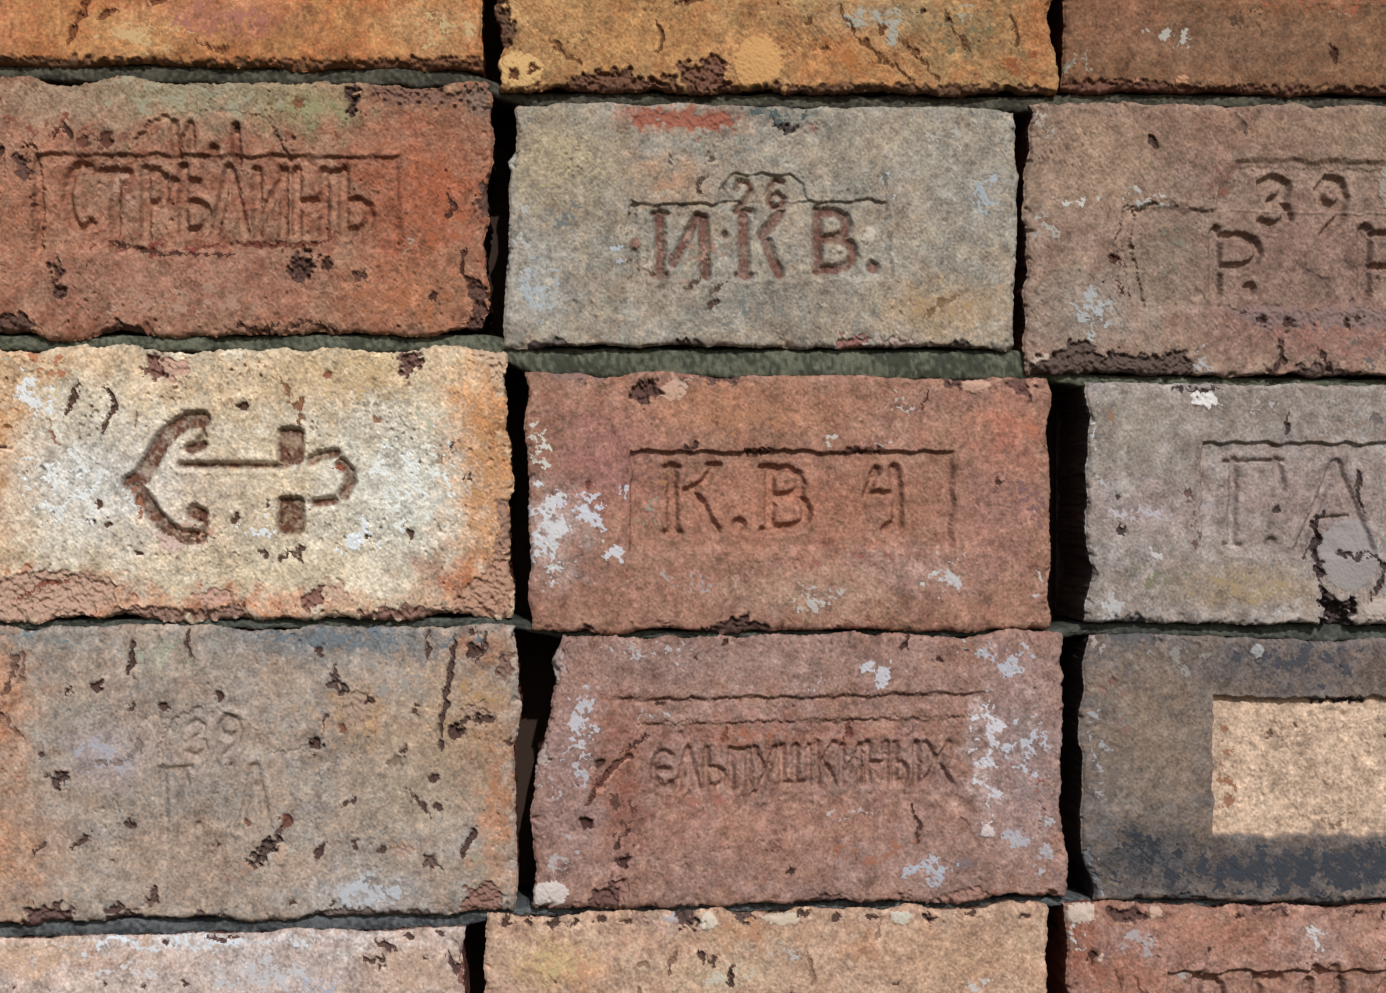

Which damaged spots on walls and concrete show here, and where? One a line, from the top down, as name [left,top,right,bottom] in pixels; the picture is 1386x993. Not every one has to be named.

damp [527,421,659,591]
damp [660,569,728,593]
spalling [1316,591,1357,625]
damp [895,639,1056,888]